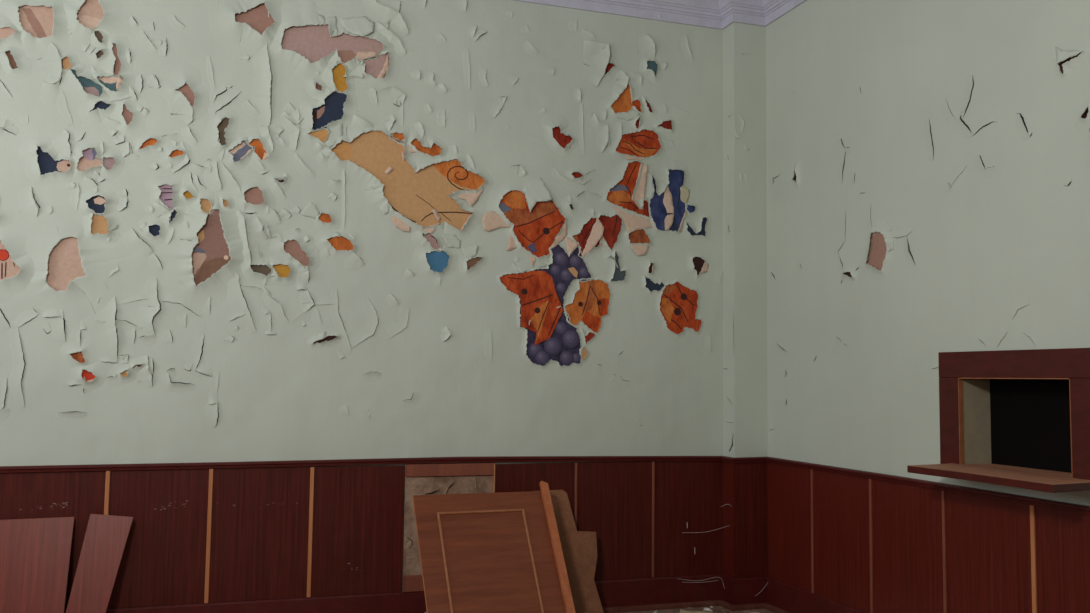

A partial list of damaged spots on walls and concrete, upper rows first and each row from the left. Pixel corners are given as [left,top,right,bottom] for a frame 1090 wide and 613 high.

peeling [0,0,712,393]
crack [924,75,1032,193]
crack [1063,175,1071,187]
peeling [838,218,896,285]
flaking render [403,475,493,576]